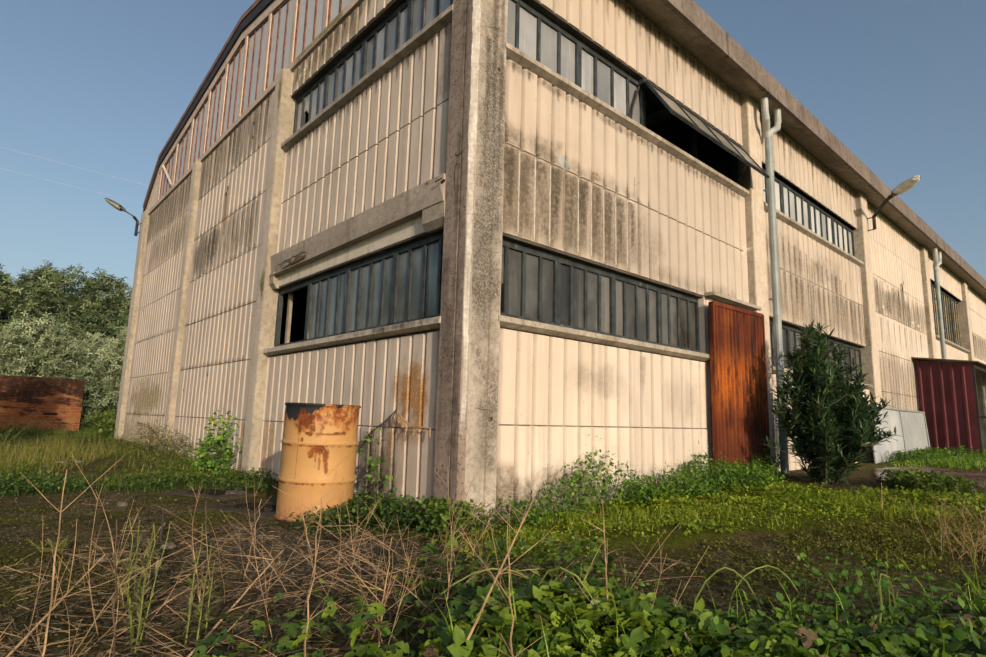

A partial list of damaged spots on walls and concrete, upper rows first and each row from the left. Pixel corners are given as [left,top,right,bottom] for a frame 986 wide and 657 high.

water stain [194,201,257,275]
water stain [457,0,638,421]
water stain [874,285,923,326]
corrosion [401,365,427,424]